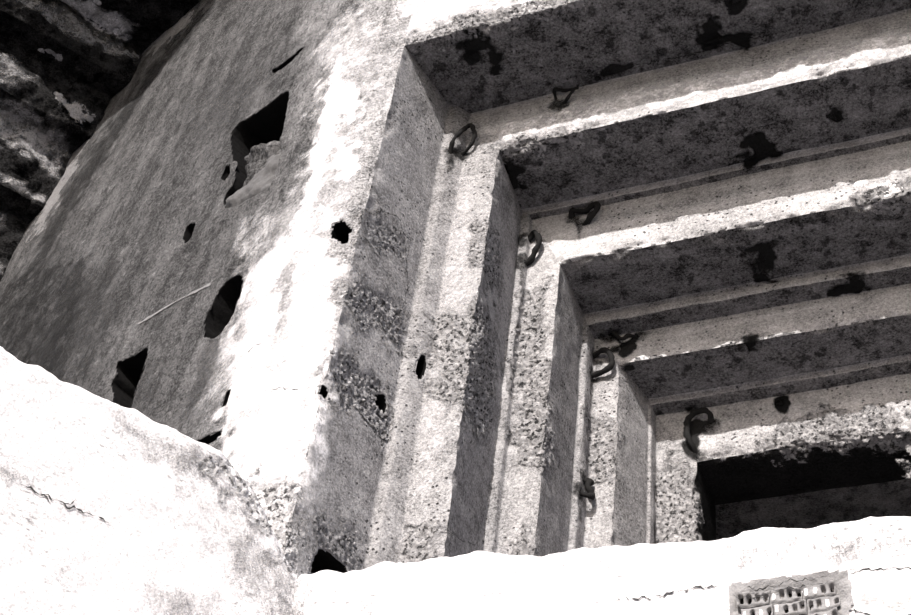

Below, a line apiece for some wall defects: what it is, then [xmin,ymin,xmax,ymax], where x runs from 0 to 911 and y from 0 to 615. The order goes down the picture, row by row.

spalling [180,220,198,246]
peeling [189,53,556,579]
rust [601,329,646,371]
rust [681,407,720,464]
spalling [714,403,911,478]
crack [21,484,109,523]
crack [851,566,911,574]